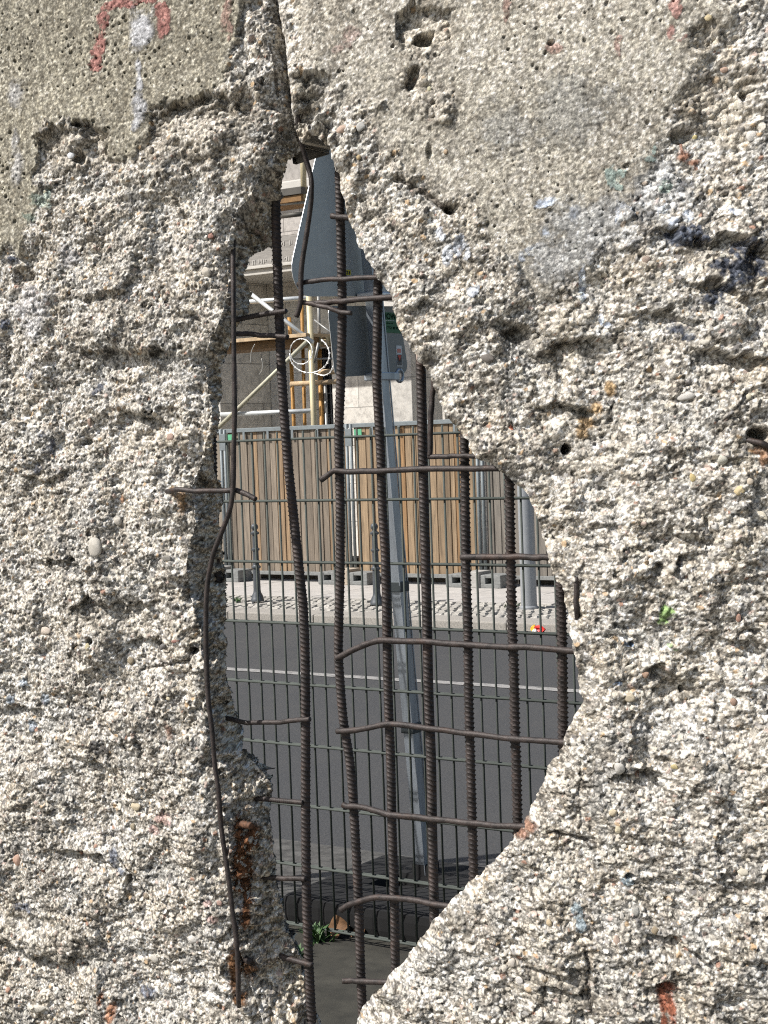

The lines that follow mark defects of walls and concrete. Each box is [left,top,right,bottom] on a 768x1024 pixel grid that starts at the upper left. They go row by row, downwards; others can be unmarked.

crack [268,43,279,98]
peeling [535,197,556,208]
peeling [435,227,470,266]
peeling [467,285,480,298]
spalling [506,323,604,371]
spalling [533,401,624,478]
corrosion [229,816,261,928]
corrosion [227,948,258,1006]
spalling [505,962,600,1006]
corrosion [658,981,676,1024]